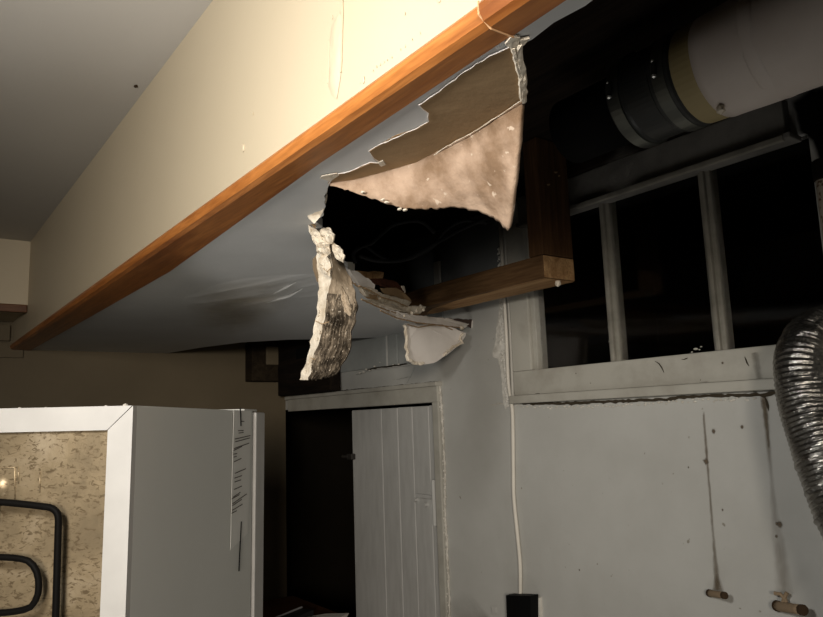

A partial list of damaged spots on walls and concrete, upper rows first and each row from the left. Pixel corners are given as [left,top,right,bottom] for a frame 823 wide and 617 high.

peeling [308,35,530,228]